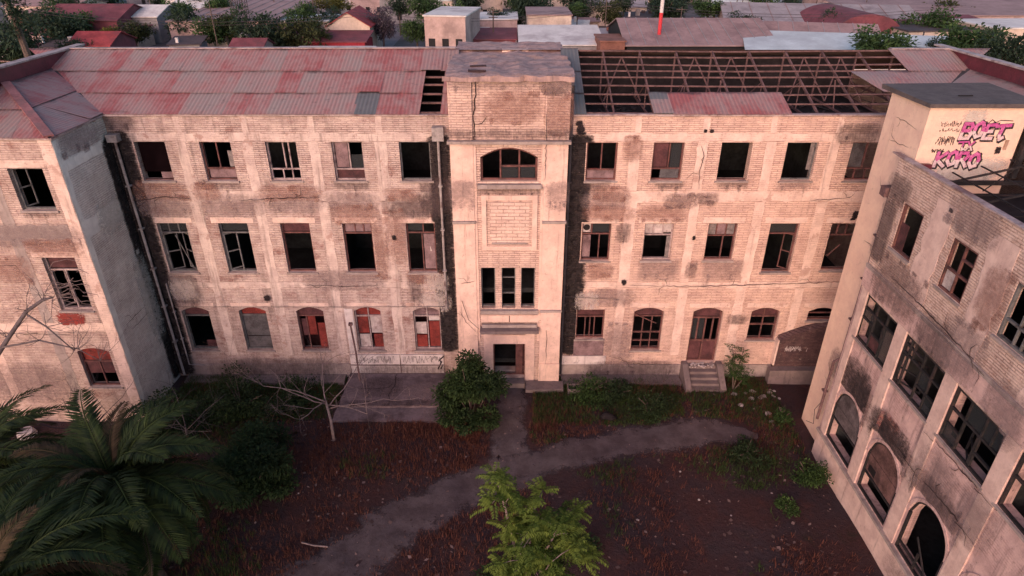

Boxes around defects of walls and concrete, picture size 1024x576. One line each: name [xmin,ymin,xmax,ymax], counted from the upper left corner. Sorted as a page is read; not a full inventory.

crack [473,82,487,137]
damp [565,285,597,309]